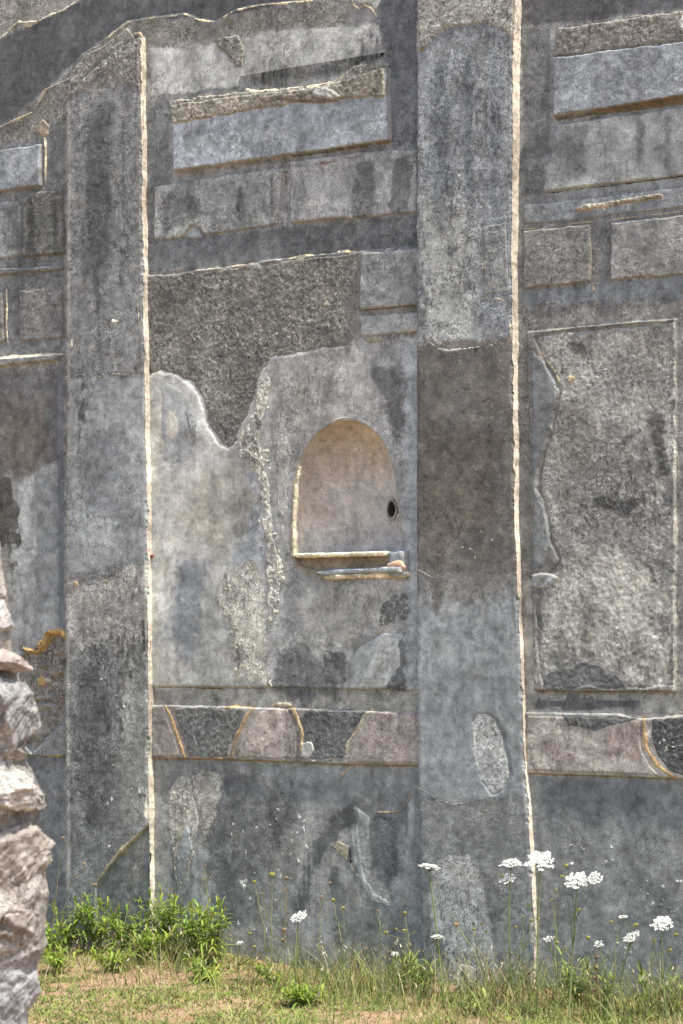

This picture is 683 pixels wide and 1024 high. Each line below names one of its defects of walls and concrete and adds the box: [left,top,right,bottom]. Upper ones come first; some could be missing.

flaking render [136,249,382,686]
flaking render [472,714,510,794]